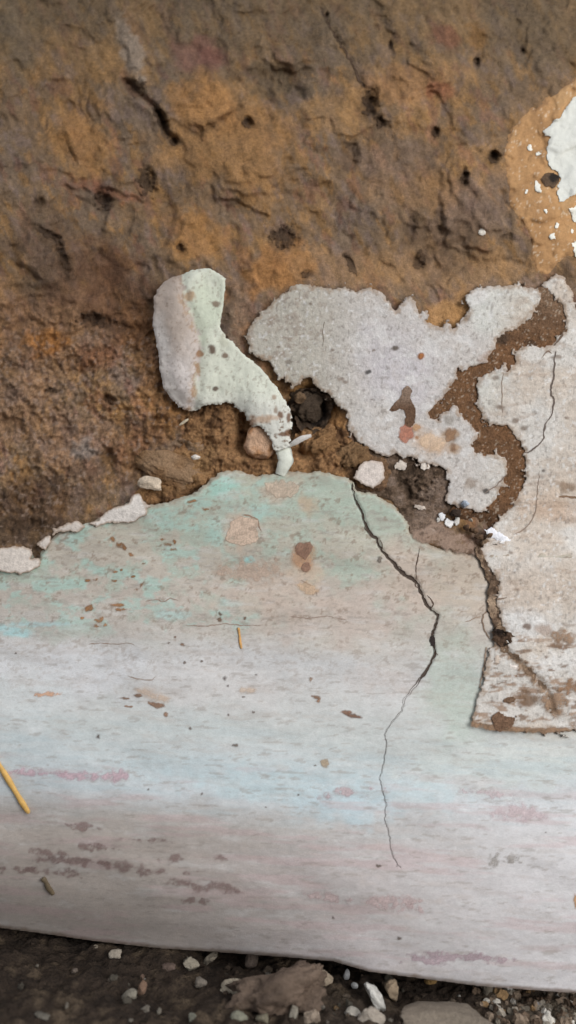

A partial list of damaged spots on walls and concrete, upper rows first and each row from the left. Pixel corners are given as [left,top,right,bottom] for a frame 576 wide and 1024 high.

flaking render [0,0,576,575]
crack [352,483,439,864]